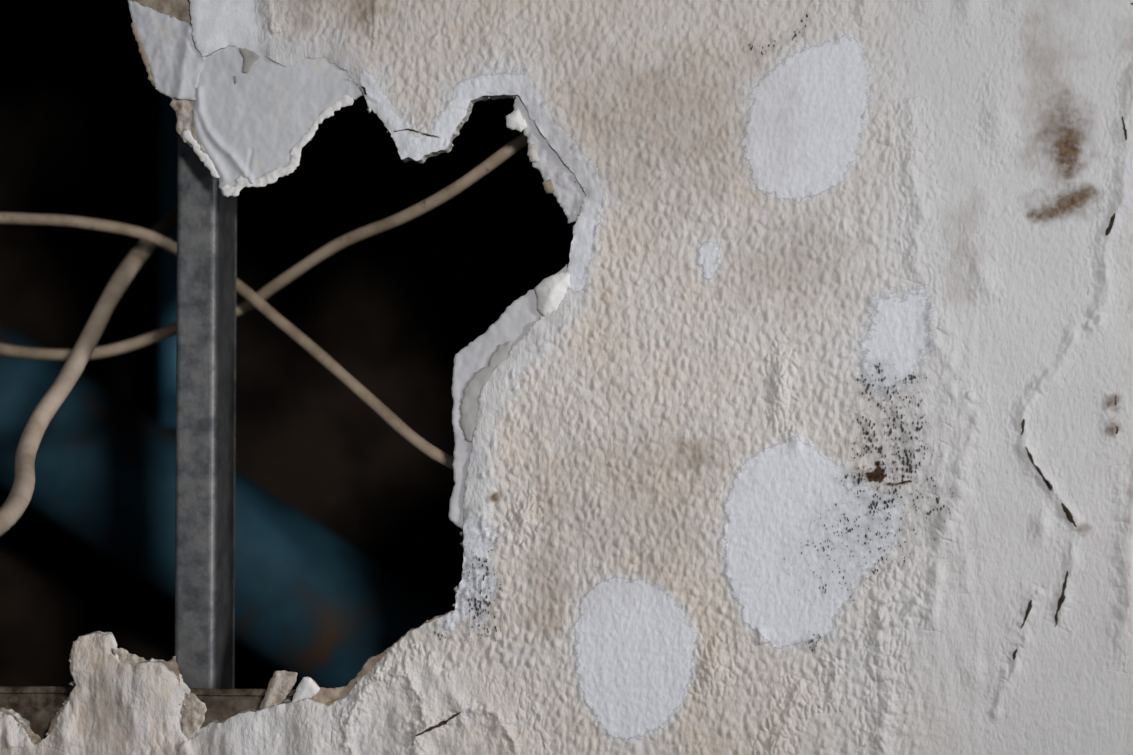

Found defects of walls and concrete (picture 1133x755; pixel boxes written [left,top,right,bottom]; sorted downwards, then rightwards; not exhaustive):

peeling [189,0,318,66]
spalling [170,98,220,178]
peeling [348,69,606,307]
rust [1029,187,1096,218]
rust [1058,130,1080,177]
crack [982,0,1133,718]
peeling [397,508,510,642]
spalling [6,709,49,745]
spalling [68,631,190,705]
peeling [200,670,298,729]